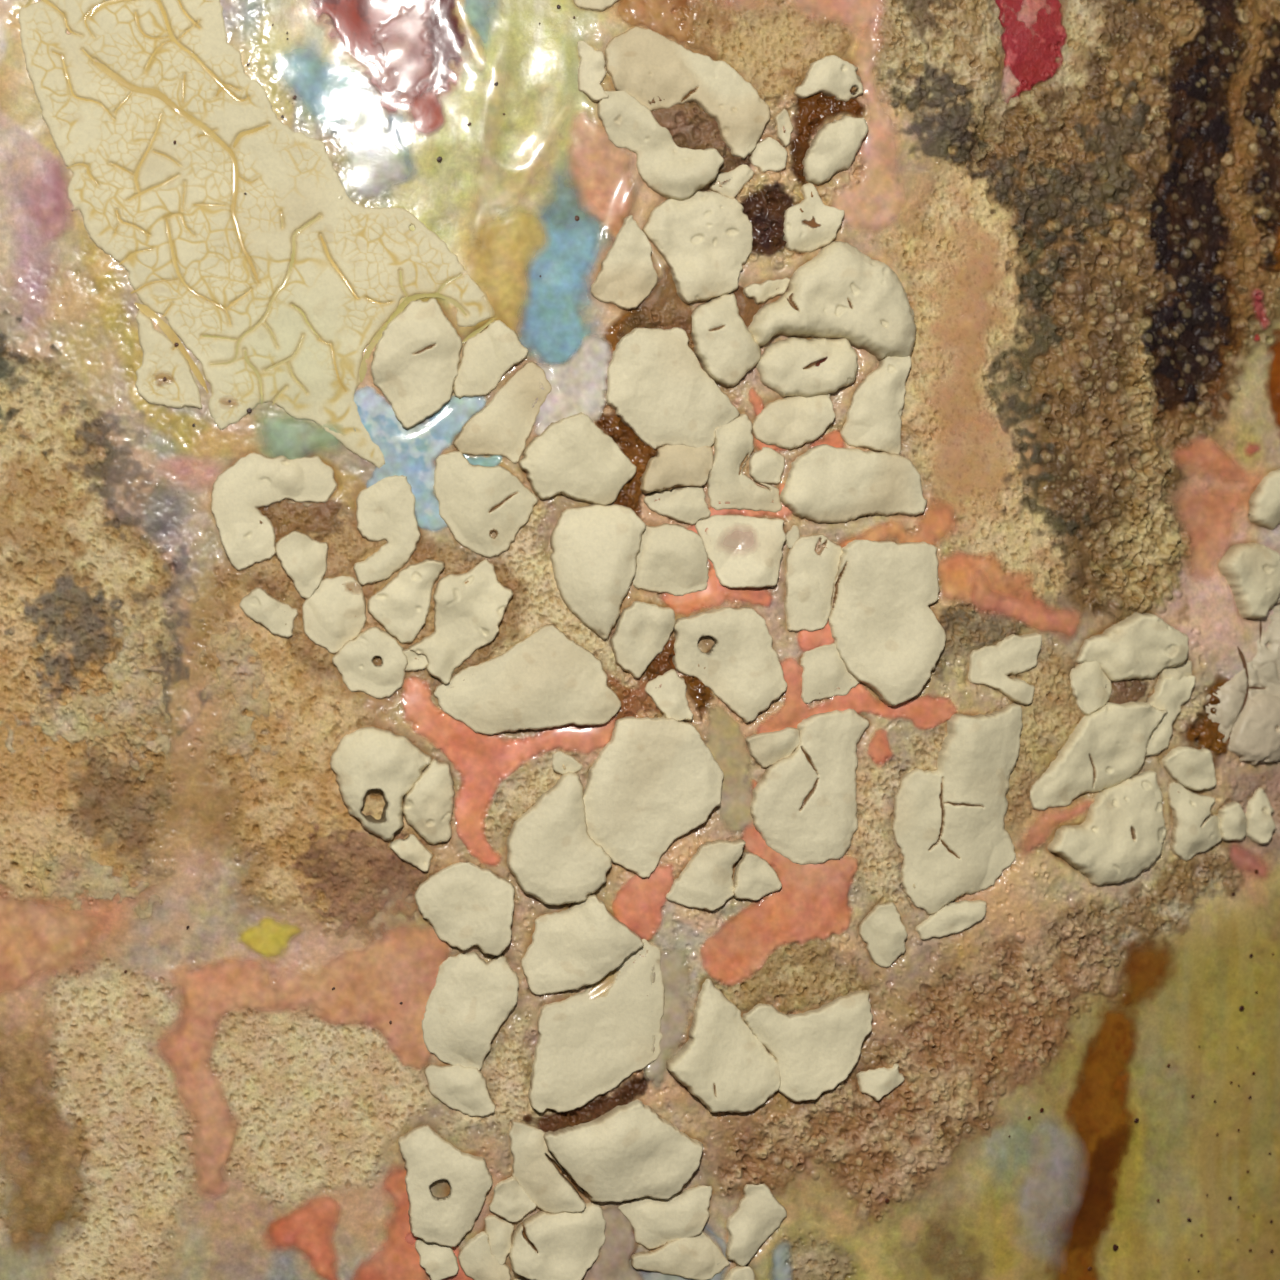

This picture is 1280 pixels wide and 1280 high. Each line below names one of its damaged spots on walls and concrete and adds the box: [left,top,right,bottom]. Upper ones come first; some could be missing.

crack [42,0,496,405]
peeling [18,0,946,1280]
peeling [859,703,1023,968]
peeling [1029,612,1276,886]
peeling [1218,542,1280,619]
crack [1230,603,1280,734]
peeling [1248,468,1280,530]
corrosion [1267,331,1280,426]
corrosion [1052,942,1170,1280]